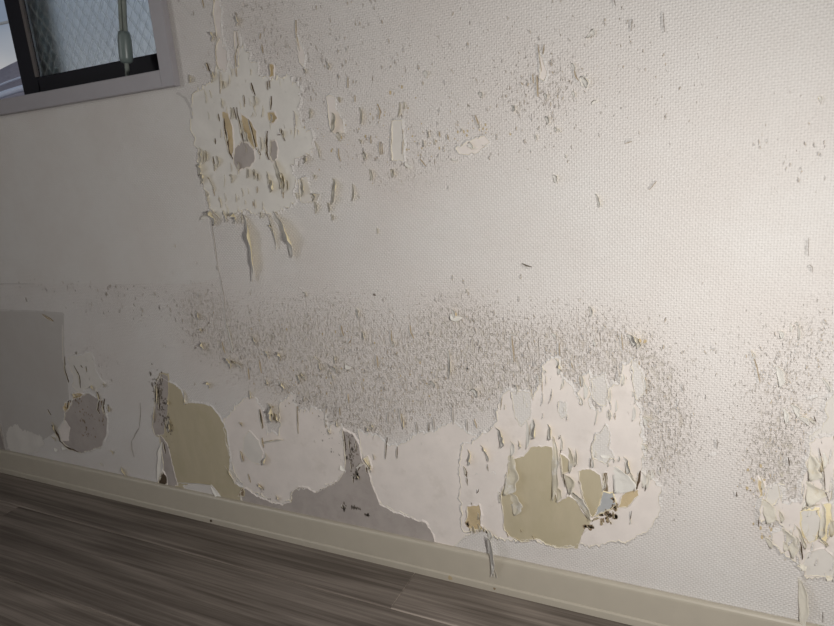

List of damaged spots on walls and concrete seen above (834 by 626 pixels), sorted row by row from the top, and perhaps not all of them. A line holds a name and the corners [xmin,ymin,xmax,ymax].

peeling [229,93,348,220]
peeling [346,77,492,178]
peeling [220,328,383,428]
flaking render [54,385,110,453]
peeling [495,419,536,457]
flaking render [242,408,434,542]
peeling [591,455,630,490]
spalling [464,503,488,534]
peeling [801,504,834,548]